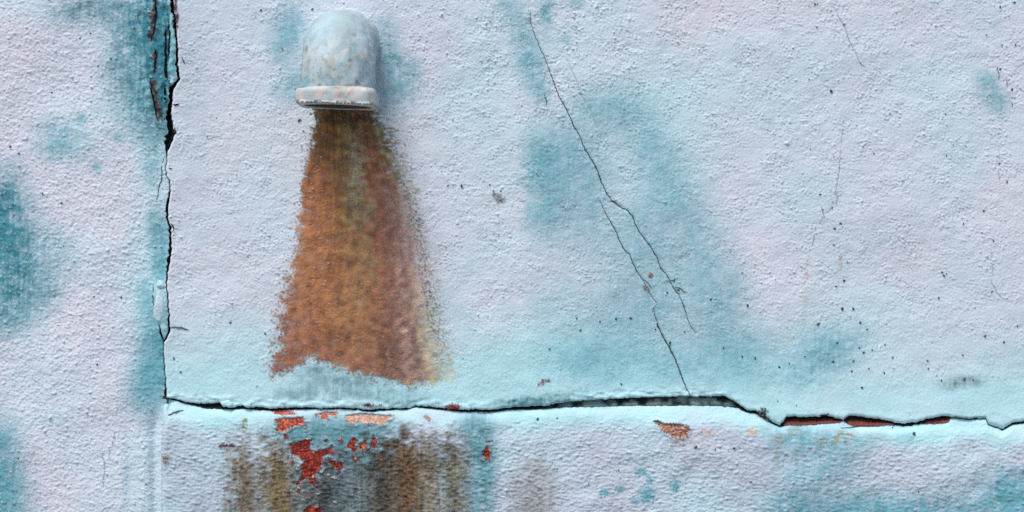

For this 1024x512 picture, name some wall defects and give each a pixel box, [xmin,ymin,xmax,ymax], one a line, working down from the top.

rust [268,109,450,387]
crack [137,0,1024,430]
rust [227,438,298,512]
peeling [272,403,394,512]
rust [369,425,469,512]
spalling [653,420,697,449]
spalling [784,405,894,428]